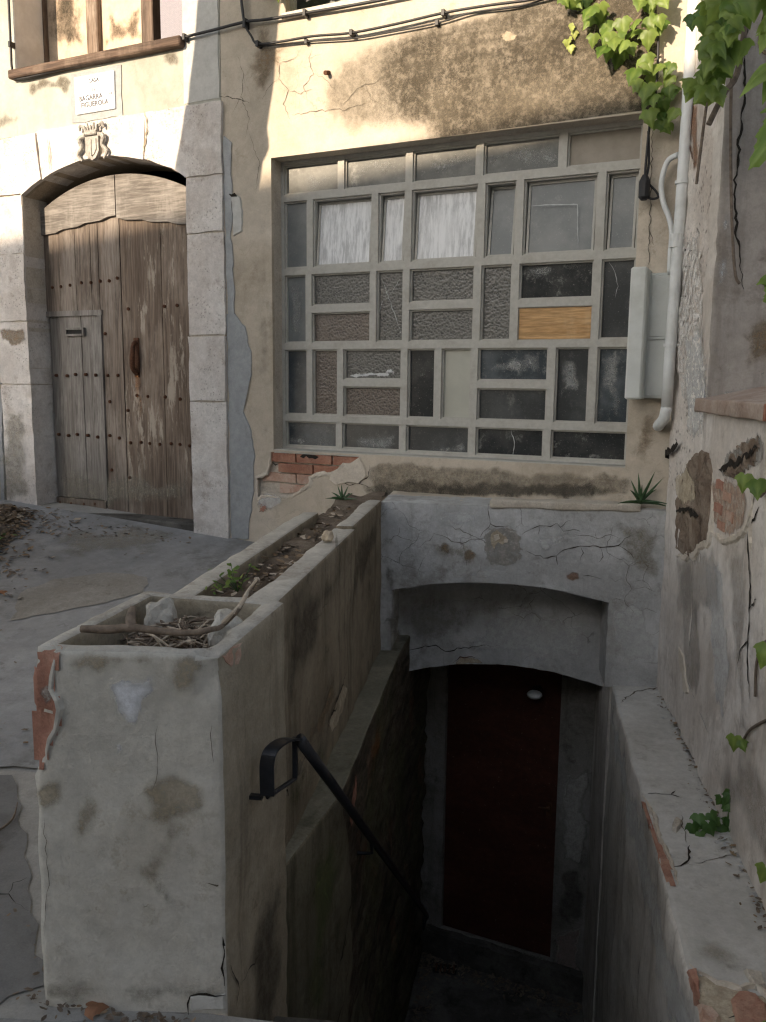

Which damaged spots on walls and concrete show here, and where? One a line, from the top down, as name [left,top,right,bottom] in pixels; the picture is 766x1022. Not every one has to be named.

leakage [53,0,78,42]
leakage [106,13,137,43]
leakage [255,31,276,86]
leakage [334,0,657,137]
crack [221,46,385,189]
flaking render [254,452,367,501]
leakage [367,464,627,498]
flaking render [675,435,763,563]
spalling [484,527,521,566]
crack [390,504,655,620]
crack [648,791,736,867]
flaking render [687,963,766,1022]